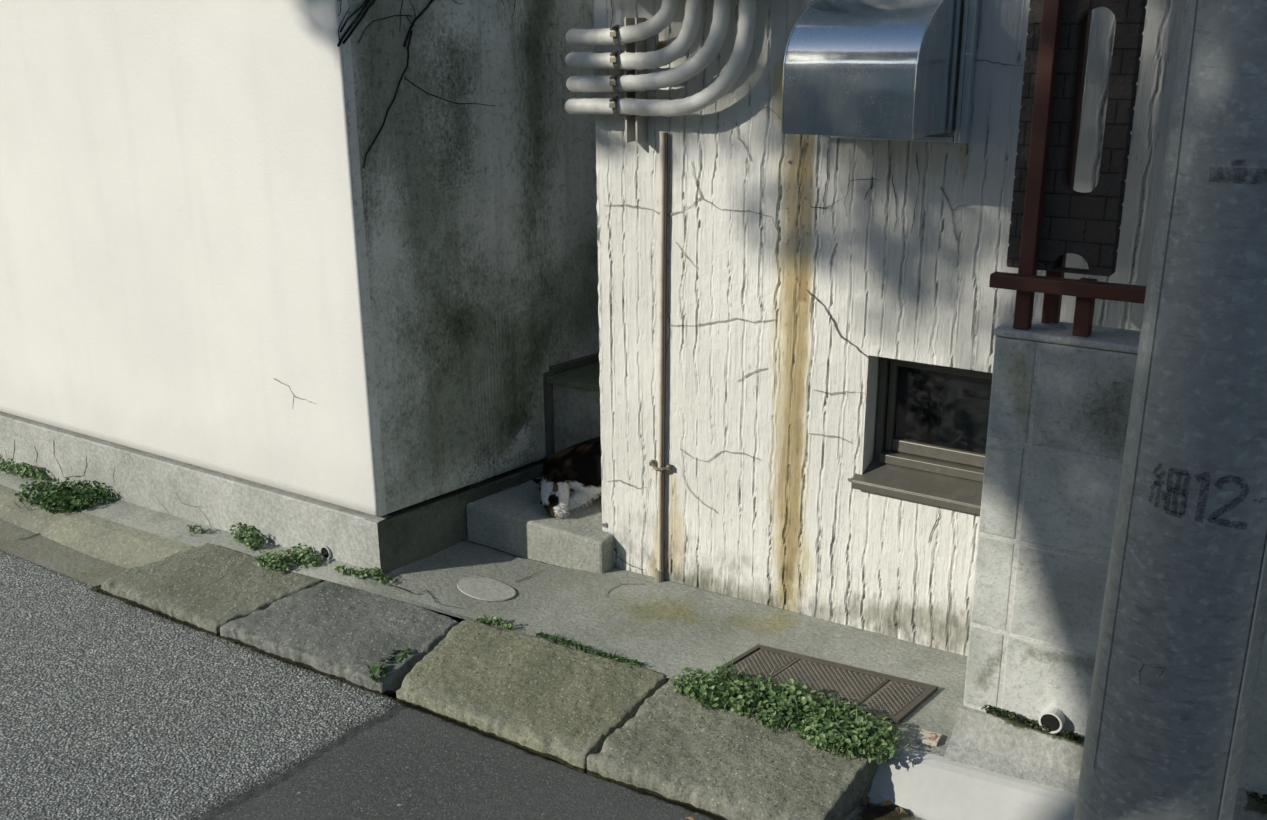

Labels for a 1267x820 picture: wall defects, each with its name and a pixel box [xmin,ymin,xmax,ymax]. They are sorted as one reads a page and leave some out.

crack [736,107,781,161]
crack [604,162,781,269]
crack [810,142,966,255]
crack [669,318,775,326]
crack [806,289,869,358]
crack [274,378,316,409]
crack [737,368,767,382]
crack [813,388,863,396]
water stain [470,396,537,483]
crack [809,433,852,443]
crack [607,478,651,499]
crack [679,449,760,513]